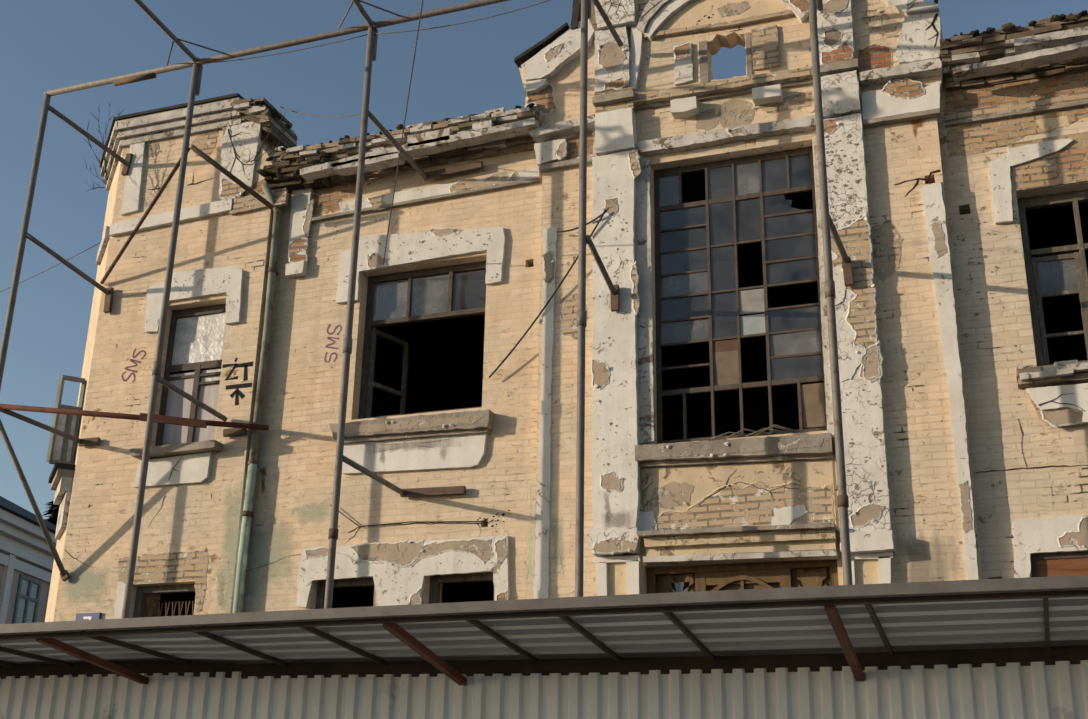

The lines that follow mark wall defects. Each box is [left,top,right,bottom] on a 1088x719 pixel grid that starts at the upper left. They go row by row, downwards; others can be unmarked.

spalling [817,0,864,64]
flaking render [628,149,642,179]
spalling [601,186,628,232]
peeling [560,294,600,340]
flaking render [591,359,611,405]
flaking render [845,335,884,404]
crack [974,393,1088,474]
crack [698,469,798,505]
flaking render [847,467,885,528]
flaking render [304,510,510,592]
flaking render [593,536,638,554]
flaking render [1057,516,1088,548]